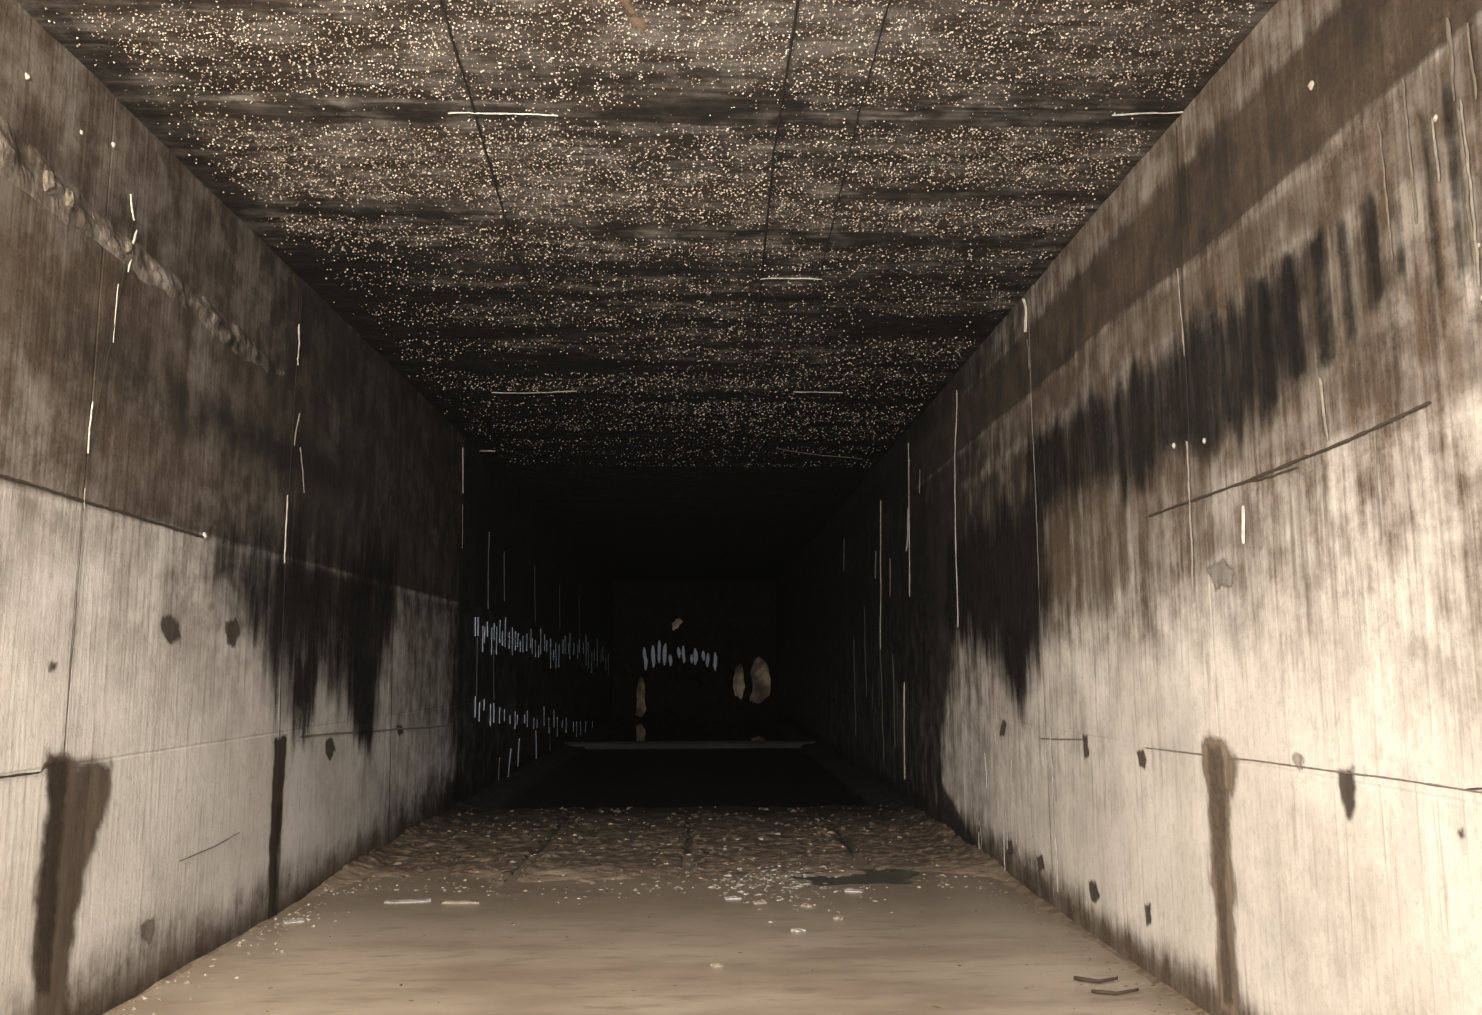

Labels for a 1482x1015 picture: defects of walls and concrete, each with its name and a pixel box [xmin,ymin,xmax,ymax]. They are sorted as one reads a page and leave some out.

water stain [1364,122,1402,300]
water stain [1402,18,1482,302]
water stain [1022,299,1030,369]
water stain [1177,268,1185,356]
water stain [1310,227,1352,440]
water stain [1030,394,1038,537]
water stain [1172,438,1206,603]
water stain [325,633,381,753]
water stain [32,753,111,1015]
water stain [1201,736,1240,1015]